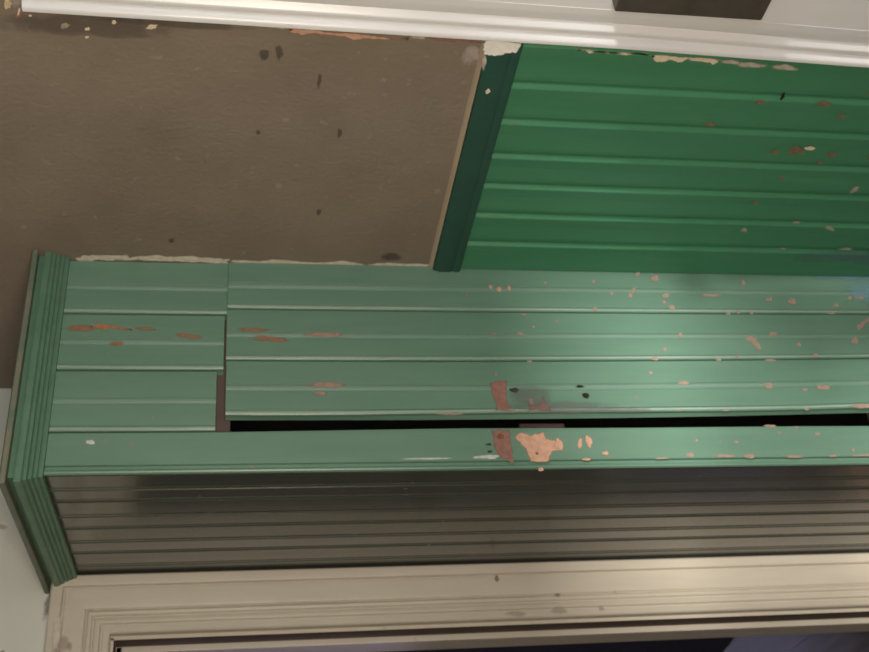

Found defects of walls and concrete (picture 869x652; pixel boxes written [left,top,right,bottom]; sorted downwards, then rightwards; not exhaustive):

peeling [577,49,796,70]
peeling [490,372,515,412]
peeling [492,429,563,471]